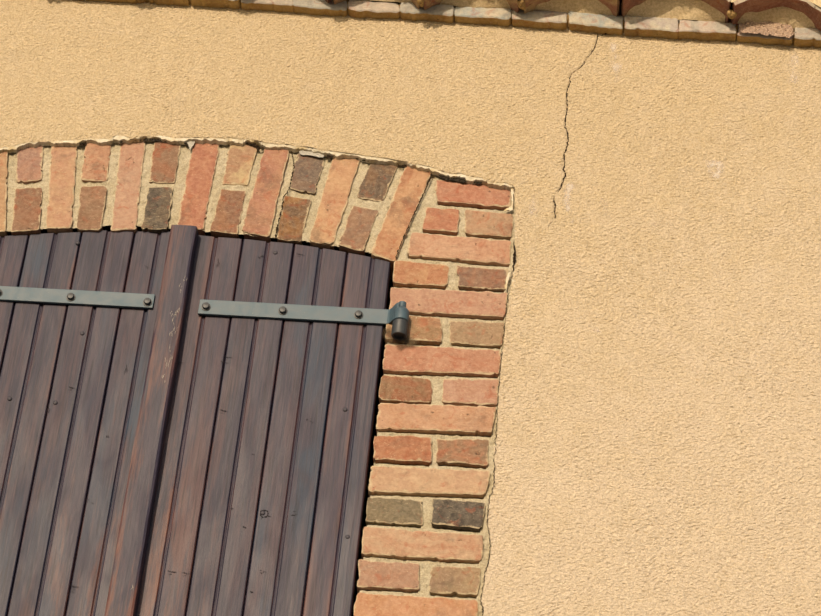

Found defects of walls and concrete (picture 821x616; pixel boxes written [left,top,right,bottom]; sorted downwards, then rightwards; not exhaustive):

crack [548,34,603,227]